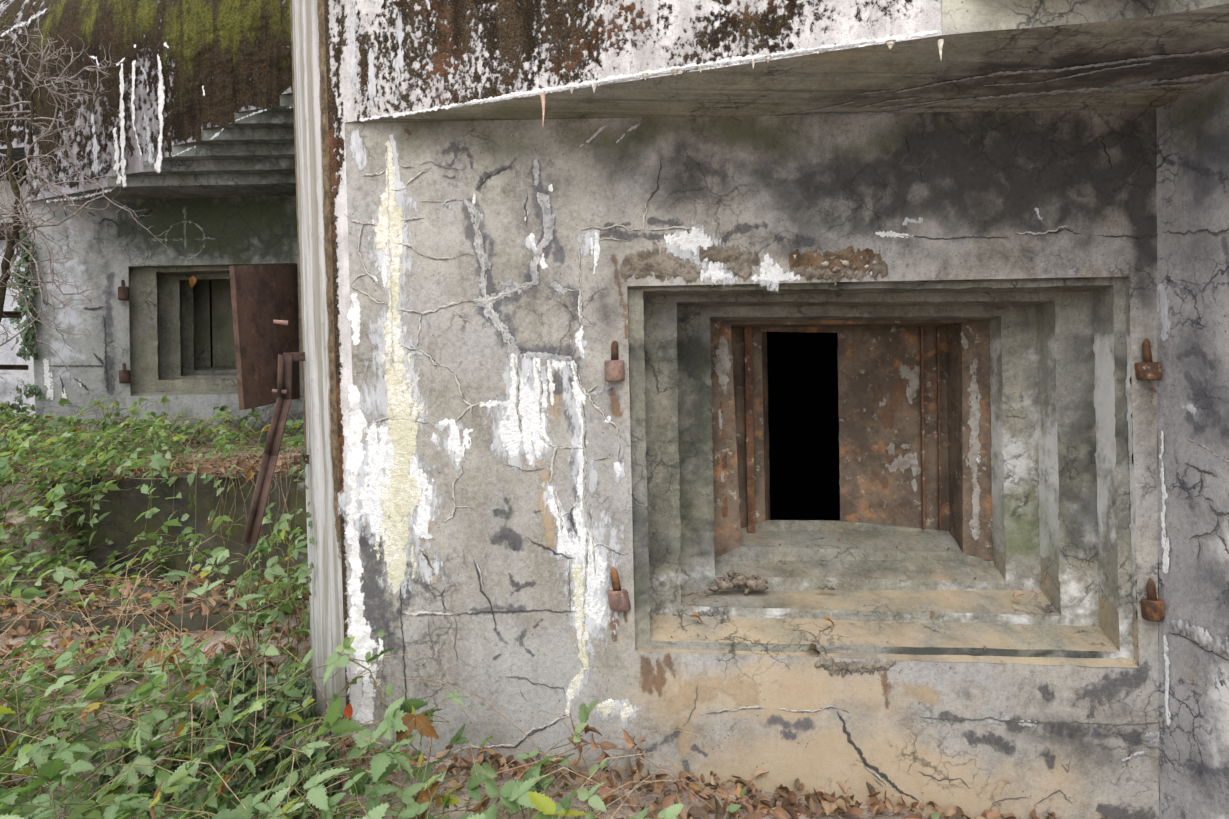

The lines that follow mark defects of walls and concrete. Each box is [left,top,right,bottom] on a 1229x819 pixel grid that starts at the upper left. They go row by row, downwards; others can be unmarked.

water stain [90,42,196,187]
crack [344,158,625,483]
crack [643,158,662,230]
spalling [620,236,888,285]
crack [875,208,1229,275]
peeling [463,428,473,450]
crack [1184,437,1229,562]
crack [399,503,628,700]
corrosion [641,654,675,695]
crack [684,685,1073,806]